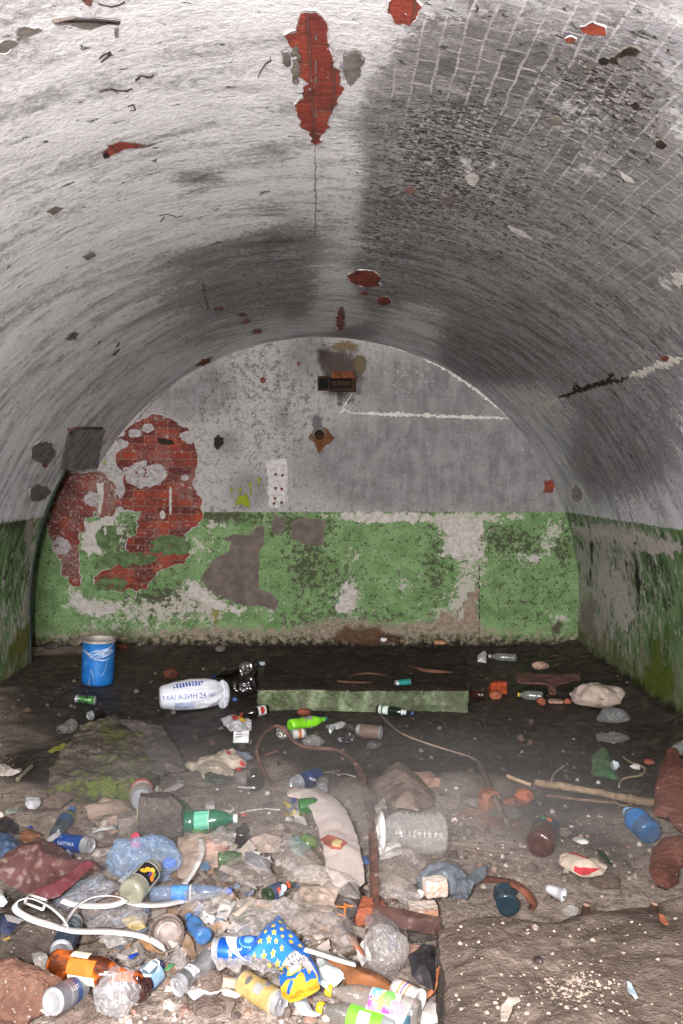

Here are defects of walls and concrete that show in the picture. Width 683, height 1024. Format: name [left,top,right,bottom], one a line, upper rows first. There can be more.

flaking render [0,0,121,55]
flaking render [386,0,423,26]
flaking render [280,8,365,145]
flaking render [101,141,162,159]
crack [311,158,319,237]
leakage [319,341,366,397]
crack [556,373,629,401]
corrosion [309,428,334,454]
flaking render [29,413,204,617]
leakage [8,517,34,661]
leakage [631,560,641,611]
leakage [636,628,675,697]